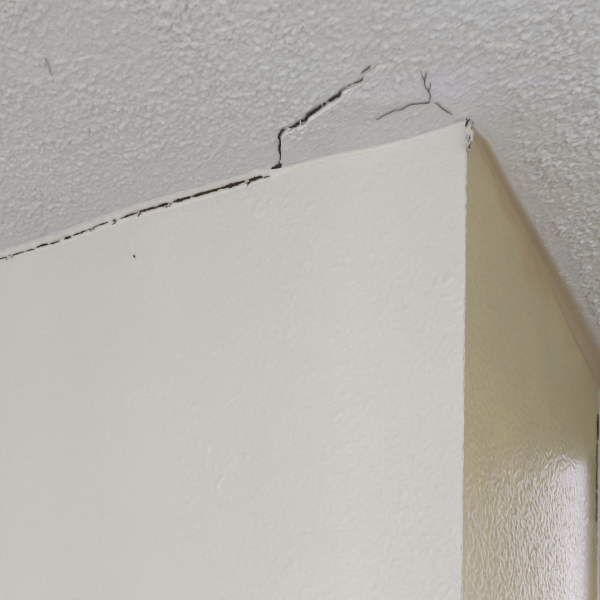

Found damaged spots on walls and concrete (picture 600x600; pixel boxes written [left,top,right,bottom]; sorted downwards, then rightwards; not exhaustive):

crack [0,66,373,260]
crack [377,72,452,120]